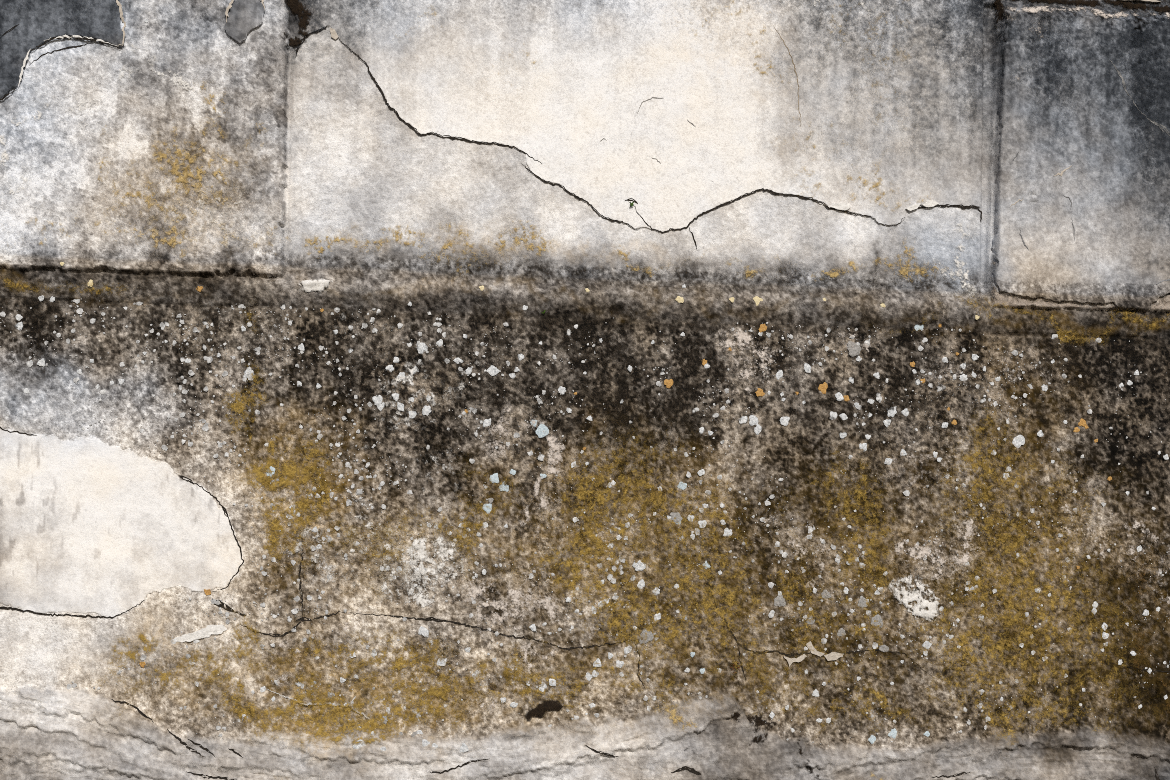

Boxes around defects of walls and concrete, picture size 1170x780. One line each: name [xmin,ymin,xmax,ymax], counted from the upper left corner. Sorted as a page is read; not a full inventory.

peeling [0,0,126,99]
peeling [224,0,265,43]
peeling [295,0,984,232]
water stain [851,0,1170,185]
peeling [991,11,1170,313]
water stain [314,254,411,276]
water stain [820,224,980,293]
water stain [0,258,990,534]
peeling [0,428,245,617]
water stain [382,537,559,636]
water stain [895,519,975,583]
water stain [520,643,554,673]